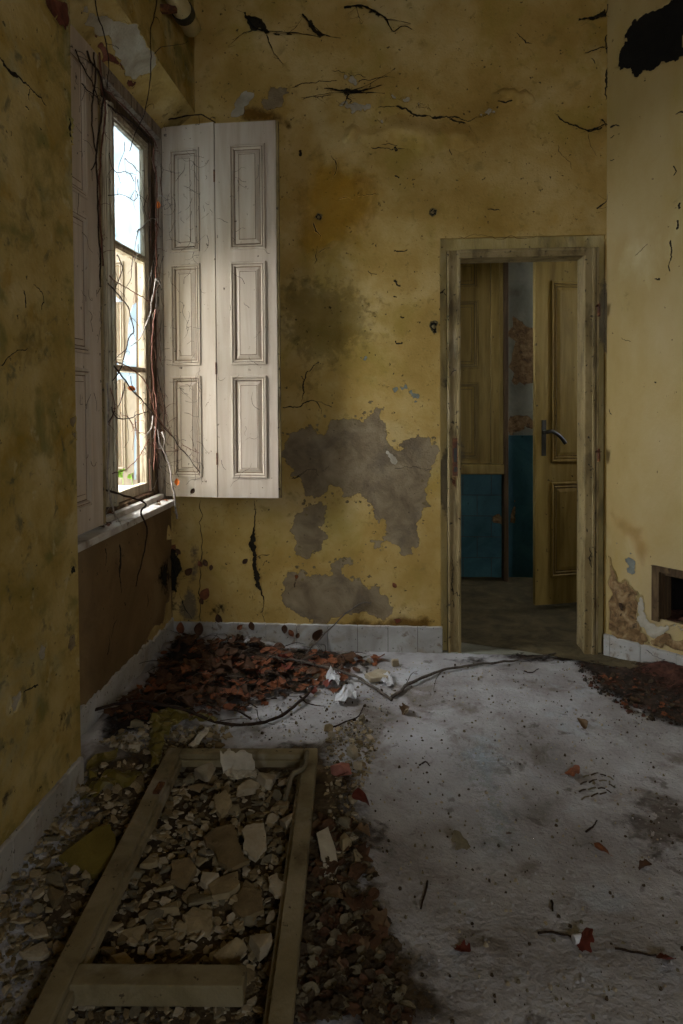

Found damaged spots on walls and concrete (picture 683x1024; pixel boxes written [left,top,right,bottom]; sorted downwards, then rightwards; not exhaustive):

peeling [43,0,158,83]
flaking render [614,0,683,81]
crack [292,70,387,100]
crack [378,99,513,132]
crack [554,113,620,169]
peeling [275,401,441,624]
crack [247,500,270,622]
spalling [607,553,683,651]